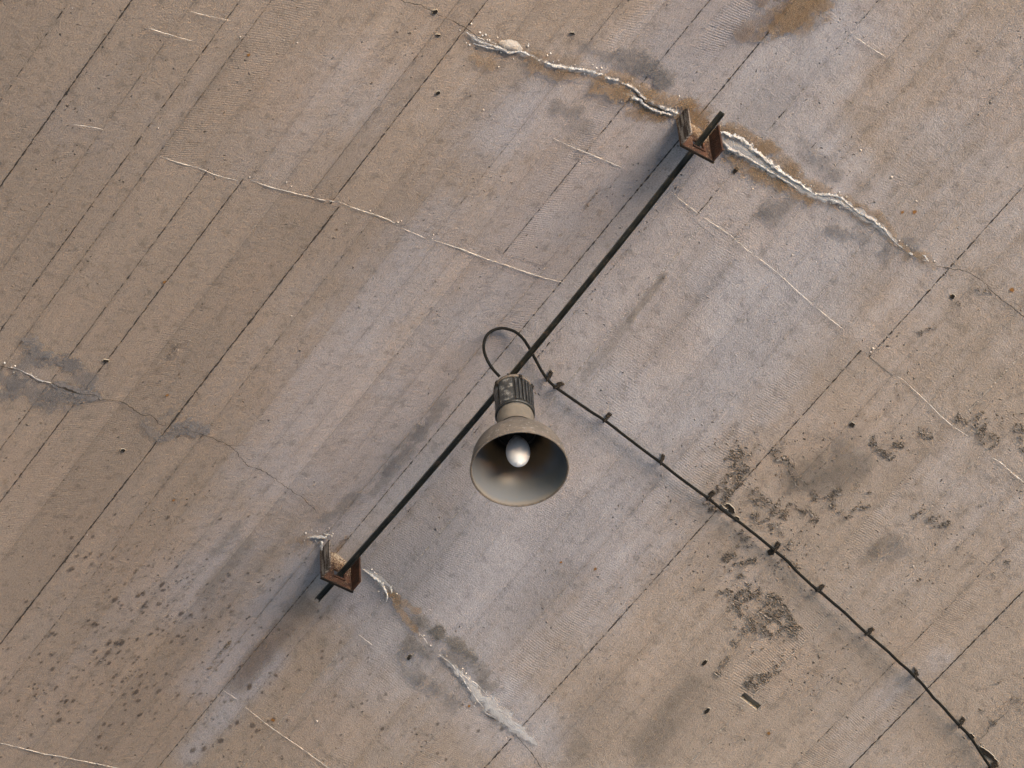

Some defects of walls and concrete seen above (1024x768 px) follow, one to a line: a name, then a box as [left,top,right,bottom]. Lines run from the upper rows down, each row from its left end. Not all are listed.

crack [401,0,680,117]
leakage [617,50,676,89]
crack [1,362,165,426]
crack [196,432,316,512]
leakage [362,568,398,602]
leakage [402,615,537,746]
crack [482,709,542,768]